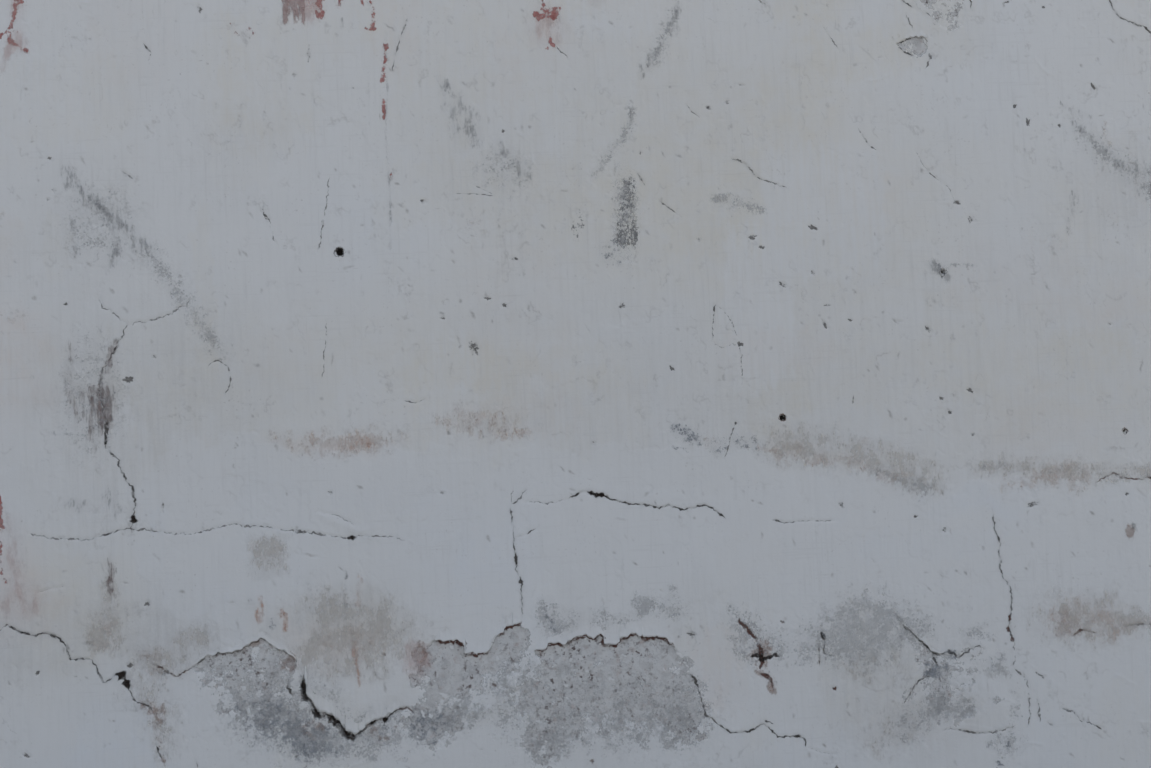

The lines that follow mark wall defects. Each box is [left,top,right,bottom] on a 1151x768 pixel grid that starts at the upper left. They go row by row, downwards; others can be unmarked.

corrosion [0,0,28,52]
corrosion [533,0,561,21]
crack [31,301,391,540]
crack [510,491,725,600]
crack [2,624,152,710]
flaking render [191,612,713,768]
crack [738,618,780,686]
crack [904,627,981,703]
crack [950,517,1043,734]